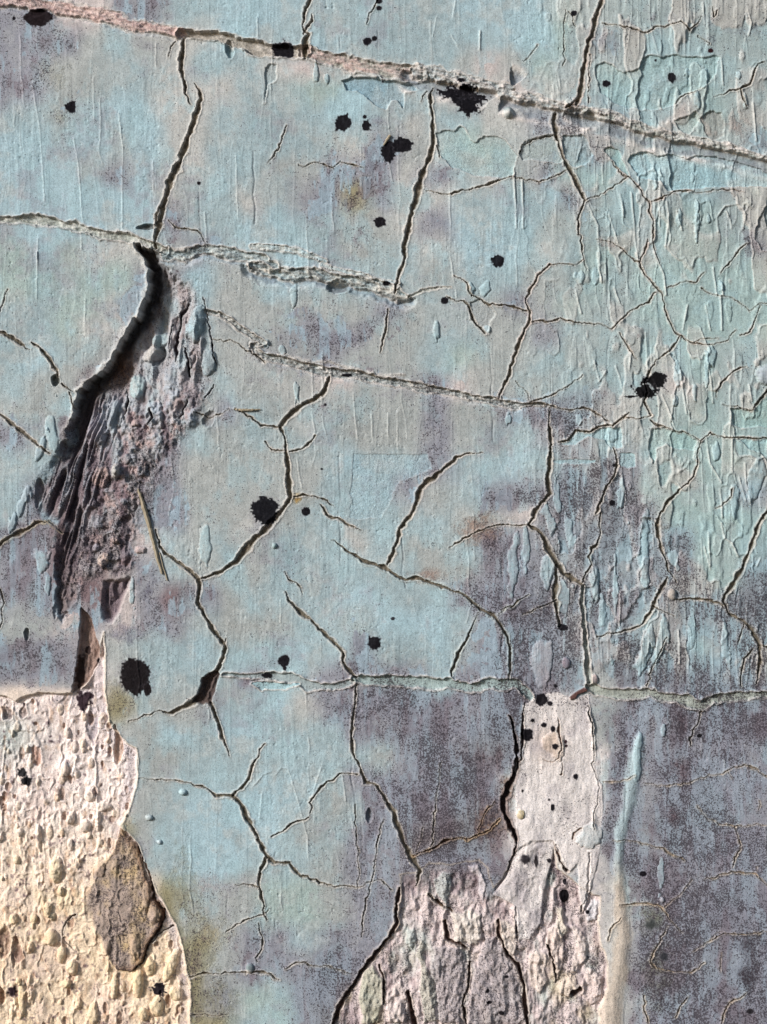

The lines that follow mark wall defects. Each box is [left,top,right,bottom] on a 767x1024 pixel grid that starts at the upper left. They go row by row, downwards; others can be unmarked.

crack [0,0,280,106]
crack [0,83,450,303]
crack [0,414,51,455]
crack [0,520,64,549]
crack [0,289,78,411]
flaking render [0,224,220,1024]
crack [129,697,230,756]
crack [155,0,767,887]
crack [140,743,393,981]
crack [428,893,453,913]
flaking render [332,688,609,1024]
crack [603,764,767,1019]